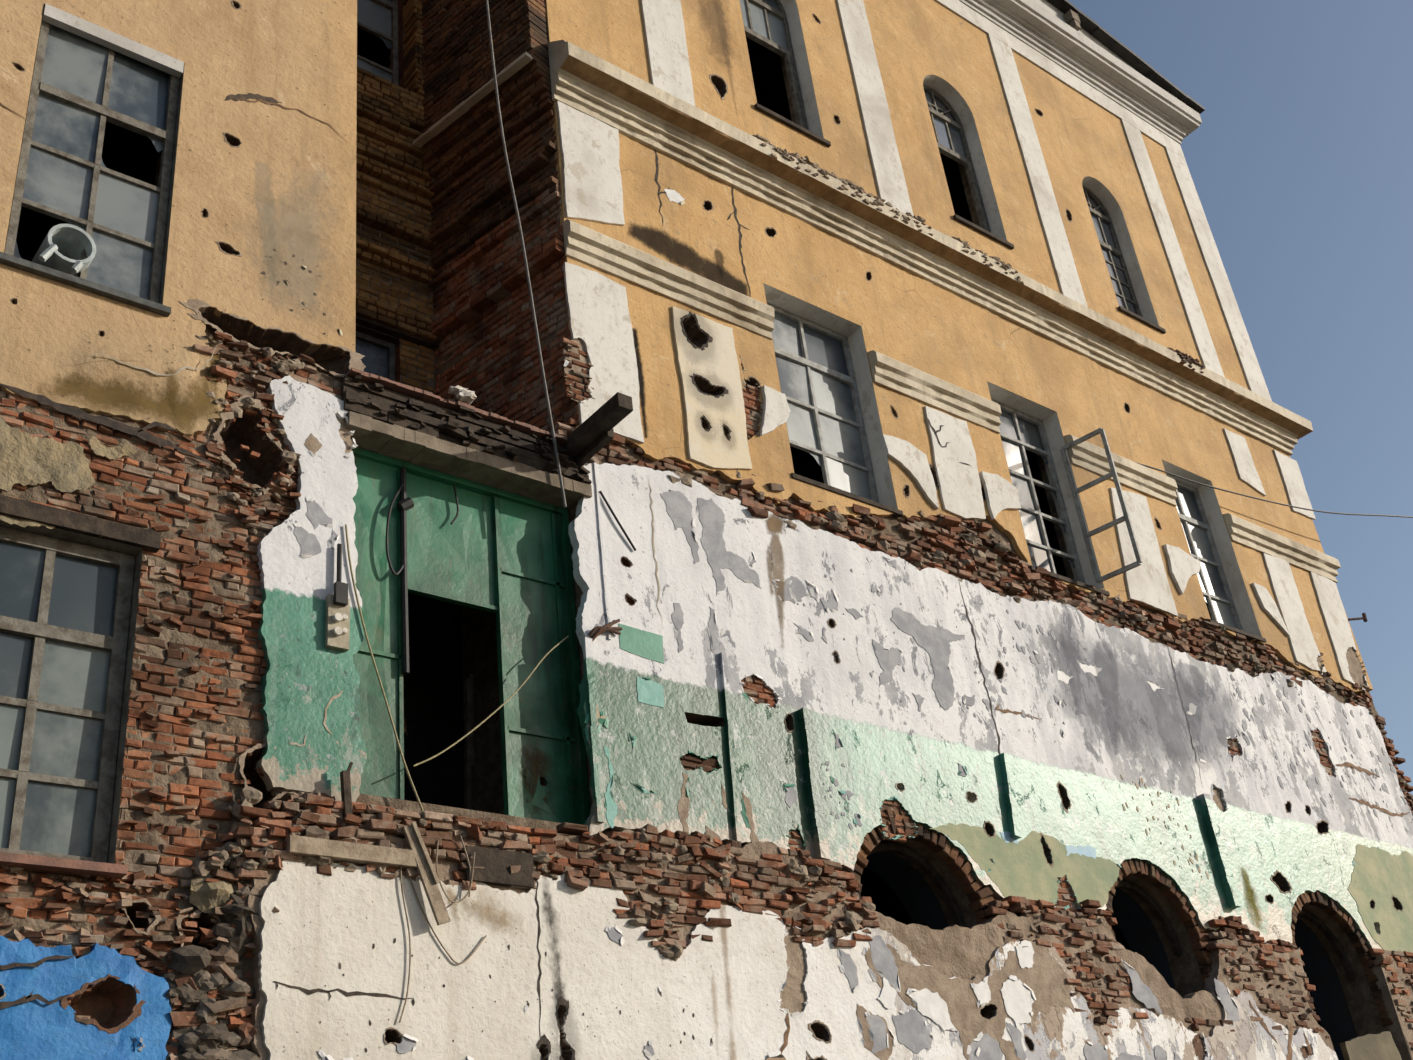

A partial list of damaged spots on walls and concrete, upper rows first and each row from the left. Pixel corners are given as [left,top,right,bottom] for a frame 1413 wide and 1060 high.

crack [232,98,347,141]
crack [654,149,669,217]
spalling [750,134,933,236]
flaking render [261,249,321,287]
crack [727,187,751,297]
spalling [952,236,1024,284]
spalling [0,299,1413,1060]
crack [959,582,1042,754]
crack [534,879,542,1039]